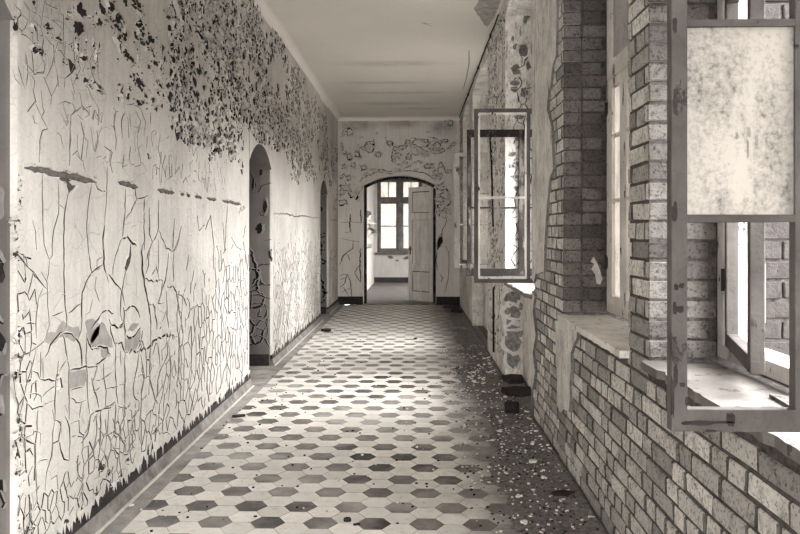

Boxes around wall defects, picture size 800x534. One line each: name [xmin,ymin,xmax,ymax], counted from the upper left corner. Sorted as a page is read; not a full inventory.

peeling [45,319,113,358]
crack [0,0,362,534]
peeling [13,0,463,265]
peeling [460,0,531,399]
spalling [532,0,560,400]
spalling [561,332,581,413]